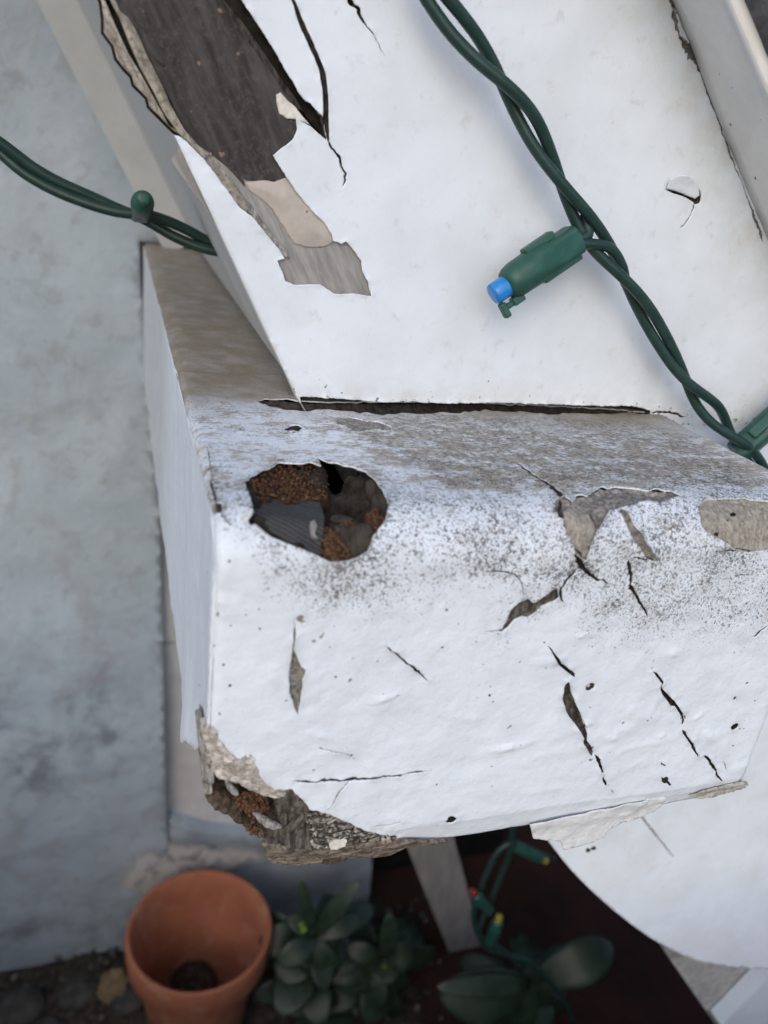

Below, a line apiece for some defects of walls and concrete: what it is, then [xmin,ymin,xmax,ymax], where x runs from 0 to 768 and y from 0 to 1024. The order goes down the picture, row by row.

crack [291,0,347,185]
peeling [97,0,371,296]
crack [490,464,679,632]
spalling [618,507,658,561]
peeling [699,499,768,552]
spalling [123,704,448,896]
peeling [289,616,306,713]
crack [298,754,423,797]
crack [388,648,427,680]
crack [548,646,613,792]
peeling [529,797,666,850]
crack [654,672,726,781]